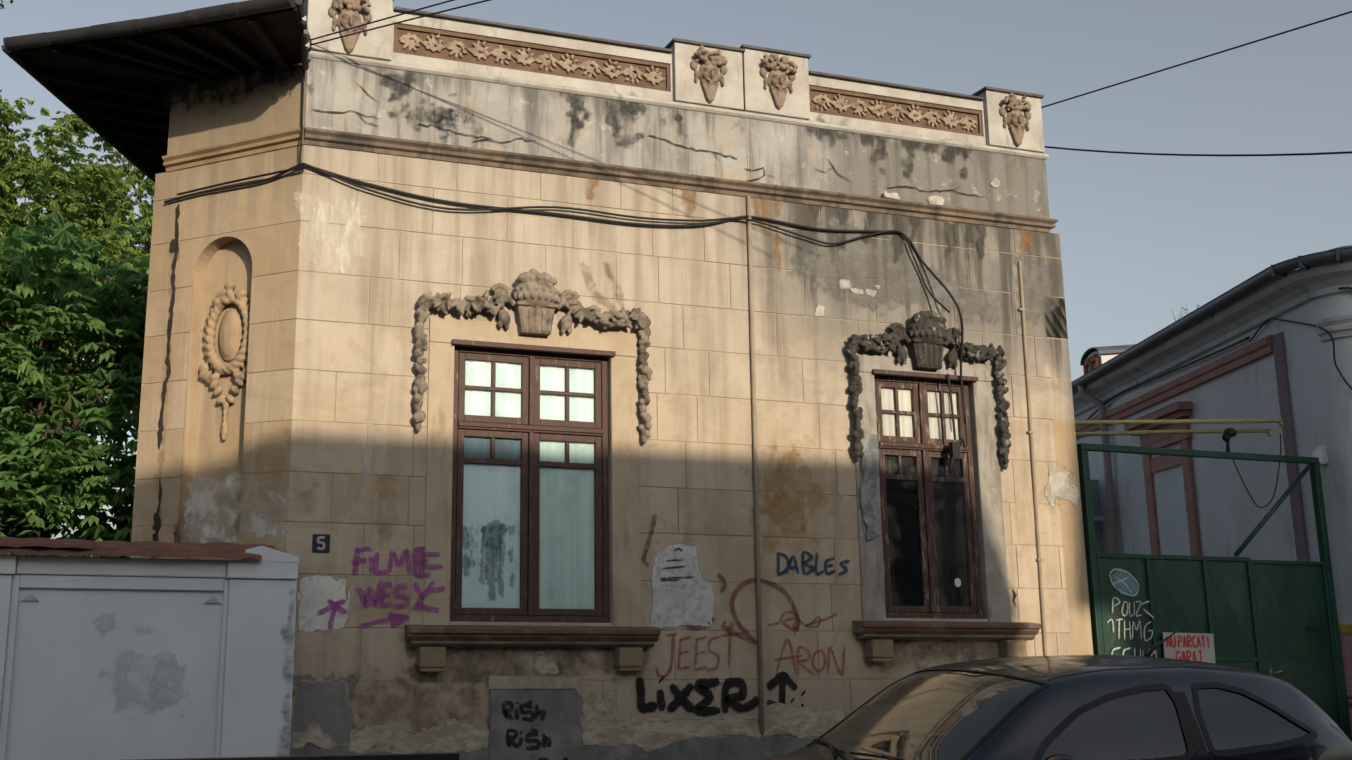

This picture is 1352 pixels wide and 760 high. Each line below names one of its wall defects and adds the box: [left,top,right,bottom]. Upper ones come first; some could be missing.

crack [312,82,379,126]
water stain [382,71,472,139]
crack [418,123,537,146]
water stain [561,93,589,145]
water stain [606,100,646,145]
water stain [808,117,886,170]
water stain [902,140,970,178]
water stain [791,204,997,323]
crack [151,204,180,559]
peeling [1044,466,1080,507]
peeling [290,678,490,754]
peeling [580,691,845,752]